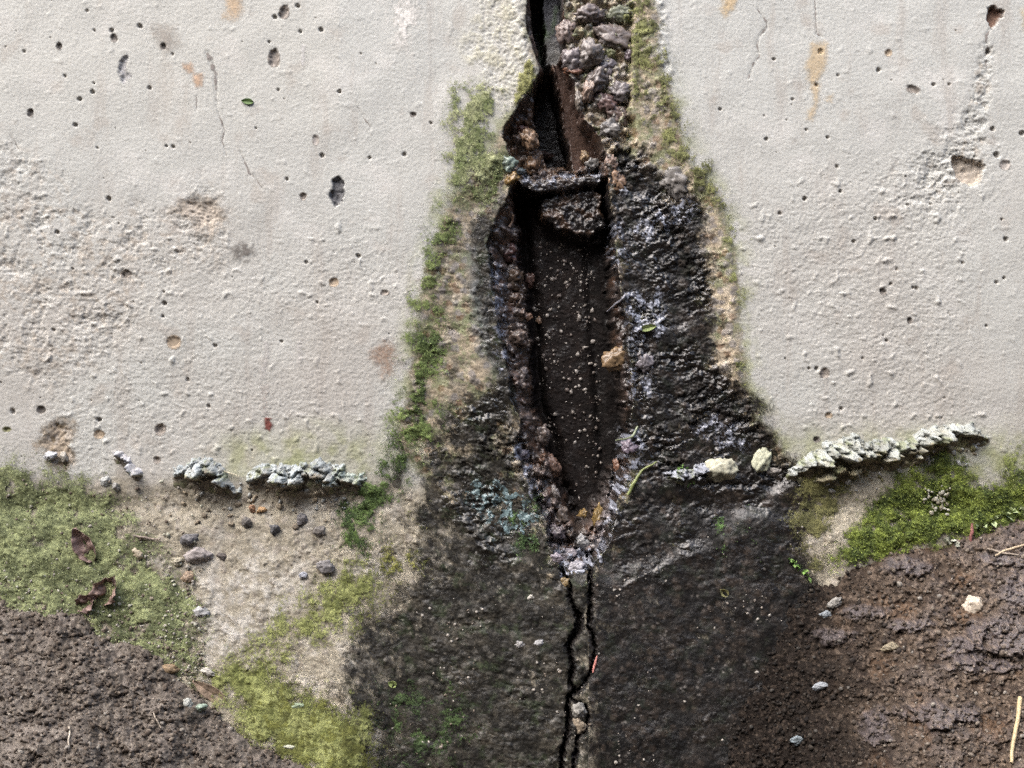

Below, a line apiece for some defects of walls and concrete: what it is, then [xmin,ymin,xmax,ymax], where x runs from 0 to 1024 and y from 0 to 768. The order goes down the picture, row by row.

leakage [328,141,824,768]
crack [558,552,598,768]
spalling [398,0,795,589]